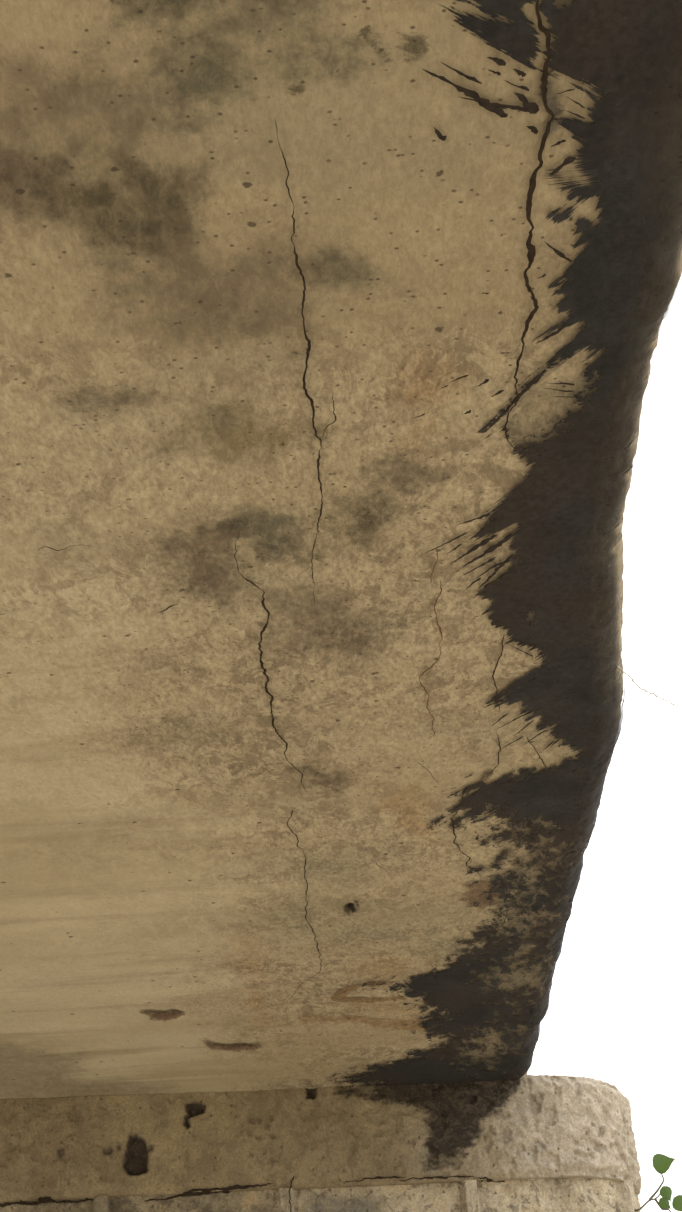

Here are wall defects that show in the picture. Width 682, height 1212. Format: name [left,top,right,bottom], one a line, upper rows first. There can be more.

leakage [67,167,183,246]
crack [234,520,322,1007]
crack [275,121,336,606]
leakage [330,0,682,1167]
crack [504,0,555,451]
crack [0,1196,98,1208]
crack [144,1176,294,1212]